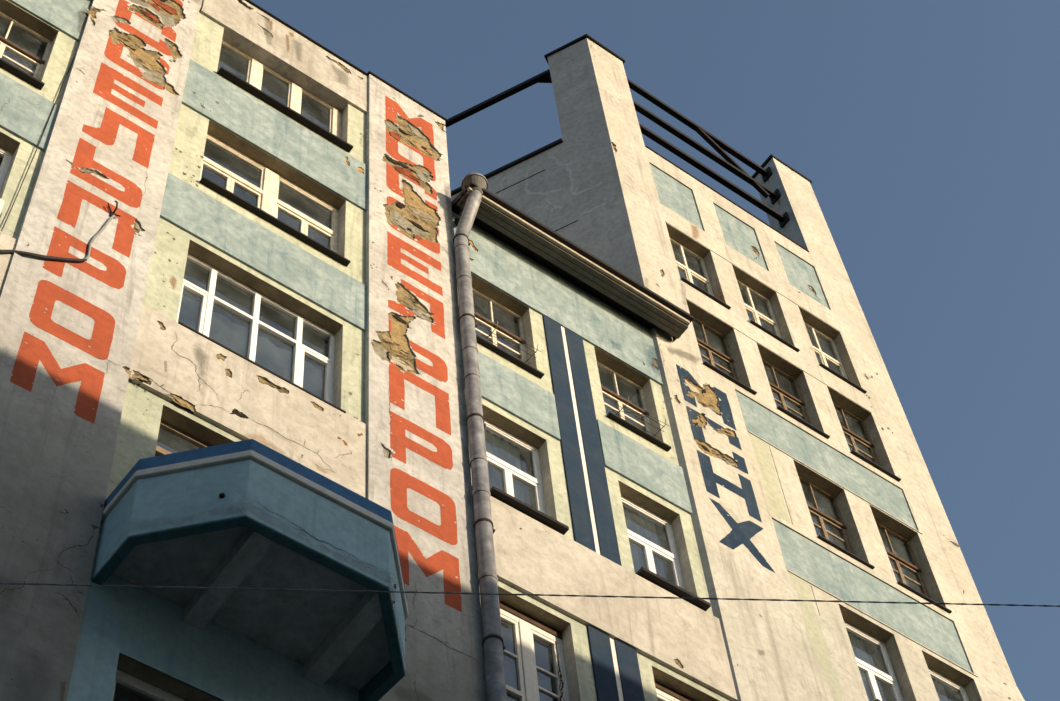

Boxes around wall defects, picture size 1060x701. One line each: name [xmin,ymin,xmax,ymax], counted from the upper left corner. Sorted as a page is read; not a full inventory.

flaking render [86,0,190,96]
flaking render [382,114,443,243]
flaking render [371,276,435,374]
flaking render [124,368,153,415]
flaking render [167,394,195,413]
crack [171,331,246,412]
peeling [257,376,288,394]
flaking render [662,376,735,437]
crack [256,422,352,473]
flaking render [695,440,737,467]
crack [248,497,380,574]